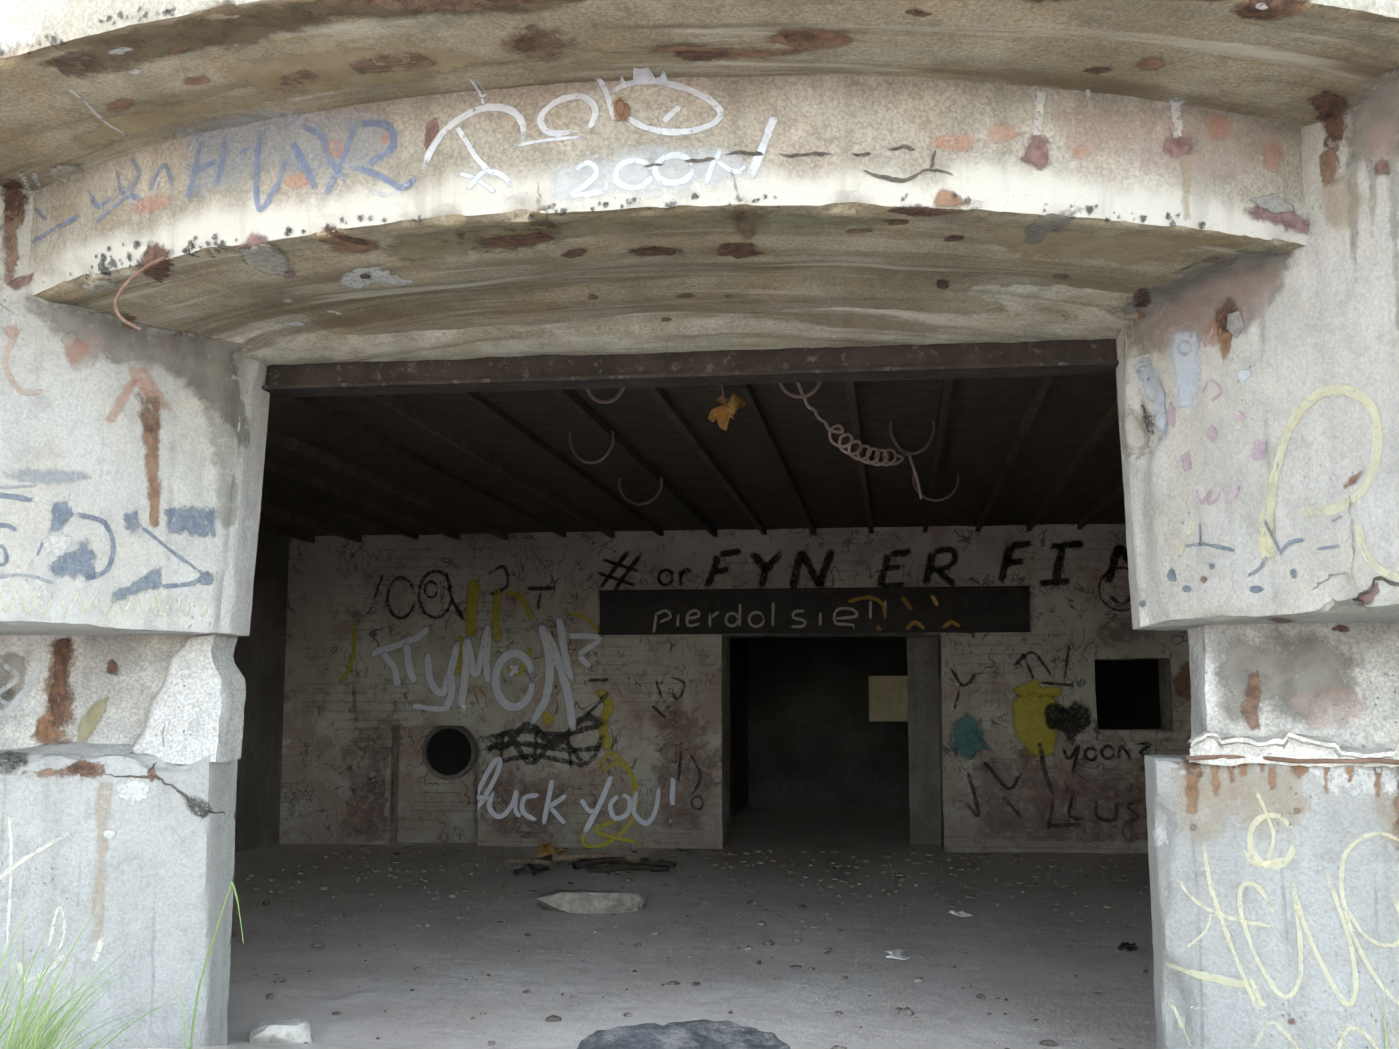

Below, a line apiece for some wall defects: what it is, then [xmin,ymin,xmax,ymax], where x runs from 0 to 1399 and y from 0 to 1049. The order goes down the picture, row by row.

corrosion [313,0,853,64]
corrosion [906,9,930,17]
corrosion [1308,91,1349,184]
corrosion [1375,160,1389,175]
corrosion [2,179,33,291]
corrosion [137,394,161,527]
crack [1352,576,1399,607]
corrosion [0,637,77,774]
corrosion [1241,671,1261,730]
crack [102,724,225,819]
corrosion [1182,757,1354,830]
corrosion [1374,768,1399,831]